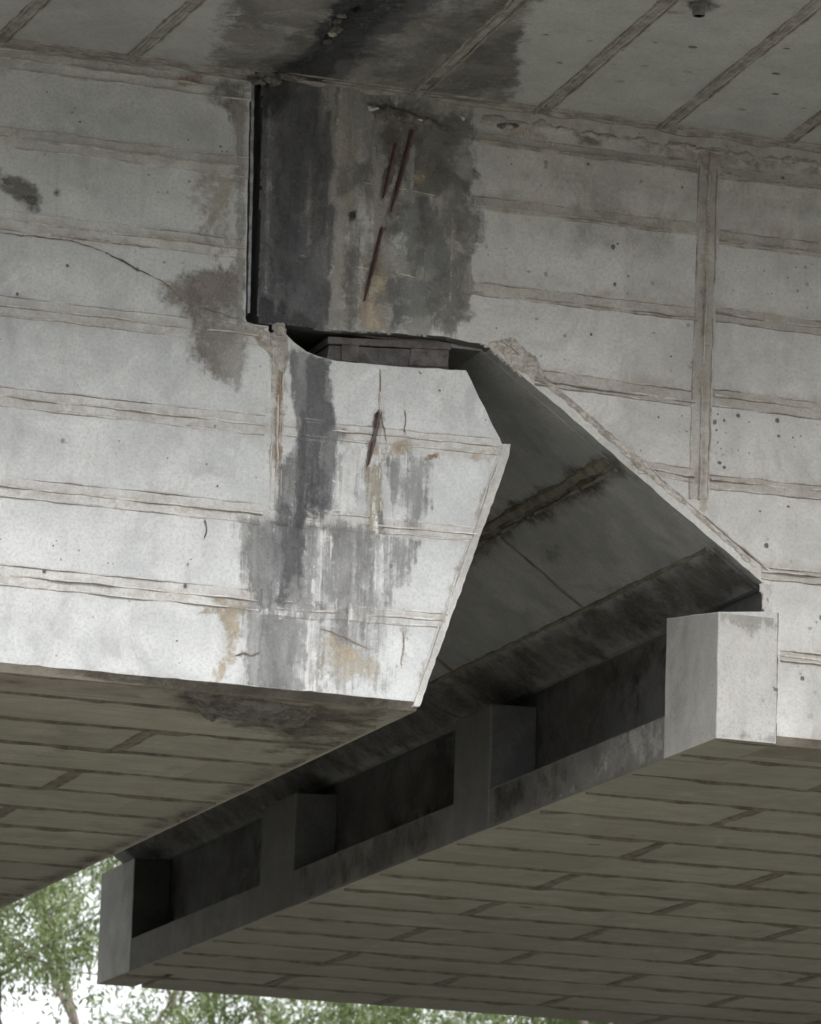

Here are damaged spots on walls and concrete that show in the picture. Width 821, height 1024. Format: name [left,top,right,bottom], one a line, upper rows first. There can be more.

crack [0,232,241,319]
damp [164,0,541,389]
damp [77,349,776,861]
spalling [480,337,756,568]